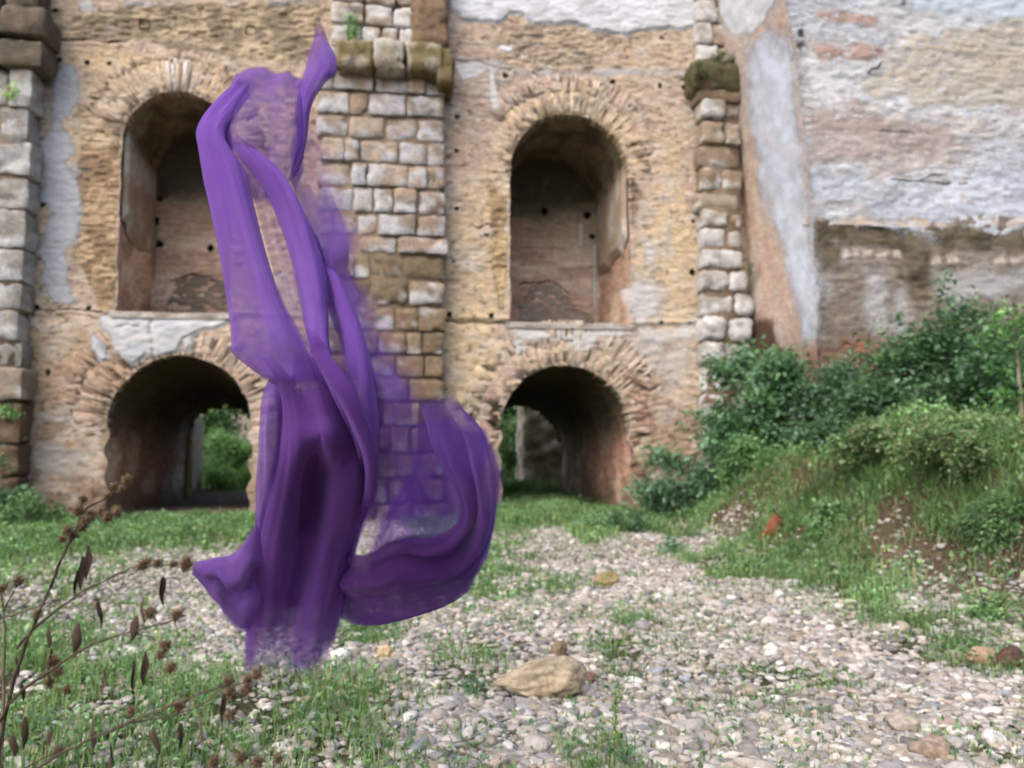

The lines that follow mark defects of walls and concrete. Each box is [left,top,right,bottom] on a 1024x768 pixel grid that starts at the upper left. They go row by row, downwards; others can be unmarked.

flaking render [449,0,695,74]
spalling [839,215,949,230]